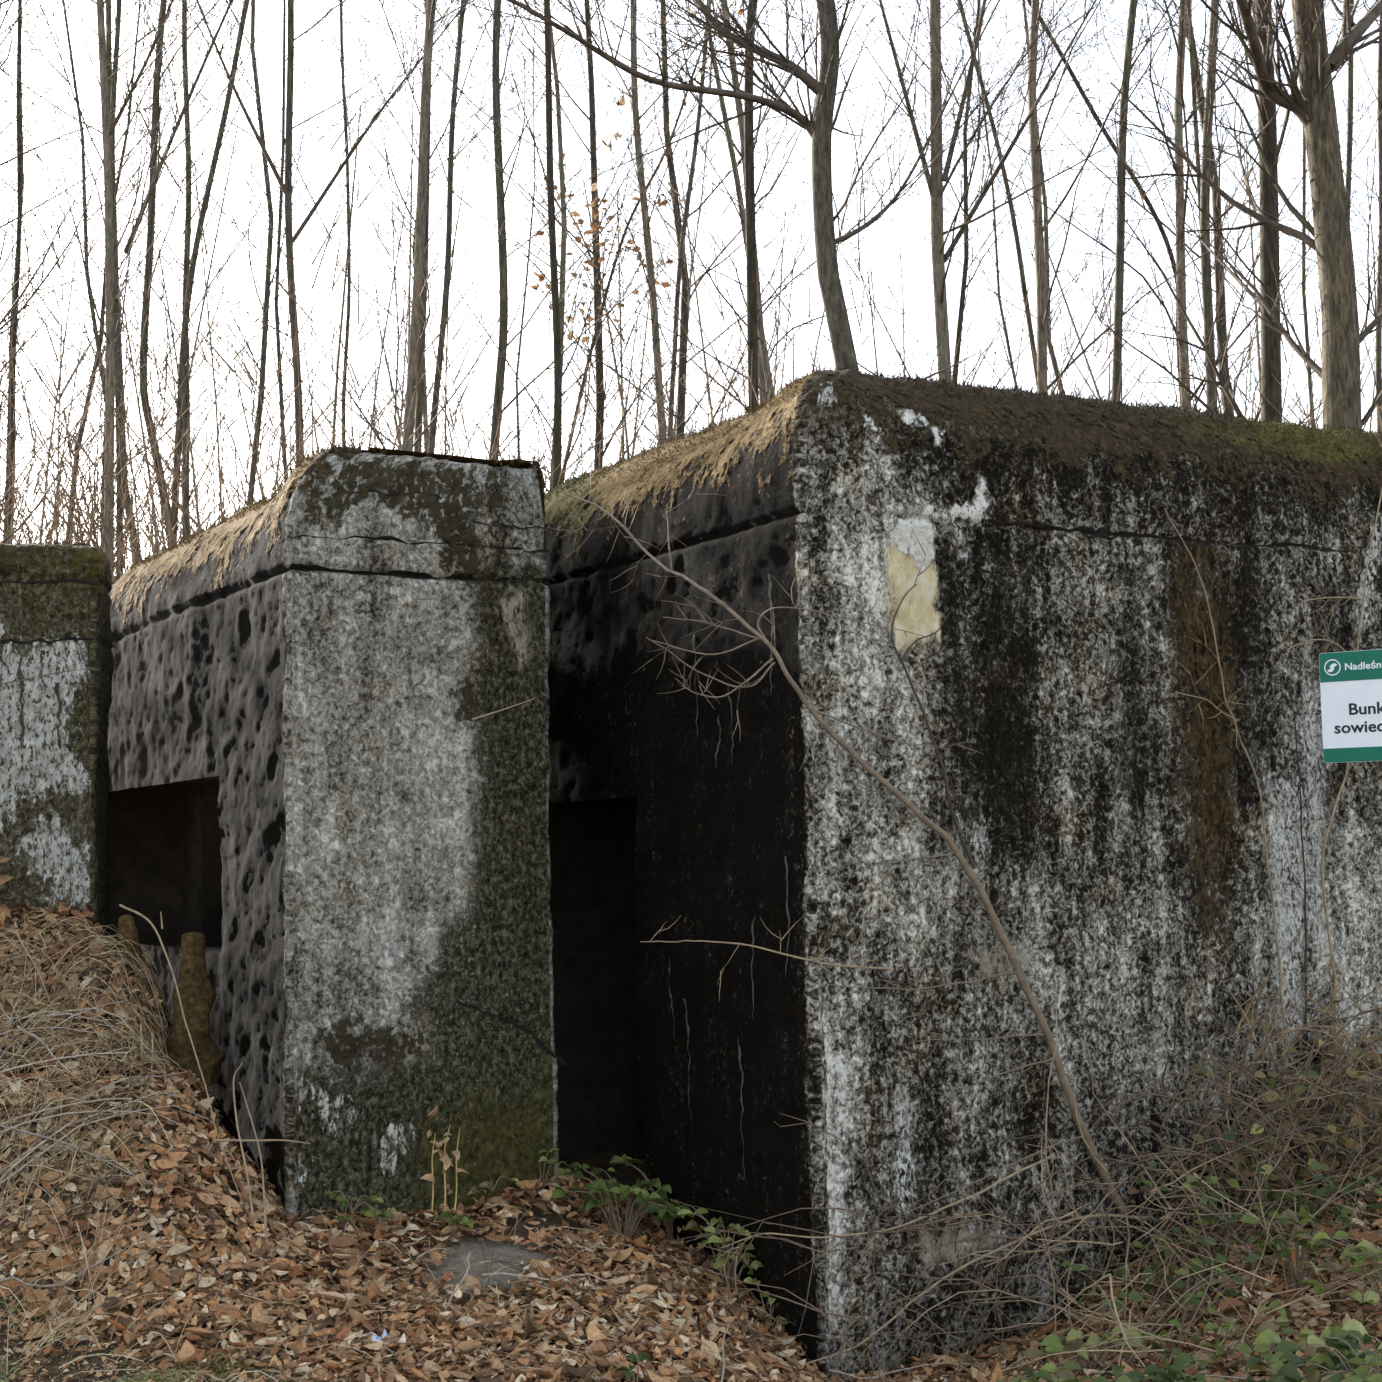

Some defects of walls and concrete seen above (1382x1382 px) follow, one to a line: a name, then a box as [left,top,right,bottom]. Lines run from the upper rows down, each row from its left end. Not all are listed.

crack [343,489,442,499]
crack [288,520,550,585]
peeling [884,478,989,651]
crack [954,519,1382,566]
water stain [1311,516,1382,653]
water stain [0,647,24,750]
water stain [40,650,62,749]
water stain [936,545,1035,862]
water stain [1107,554,1158,850]
water stain [1232,543,1347,1055]
water stain [297,554,554,1225]